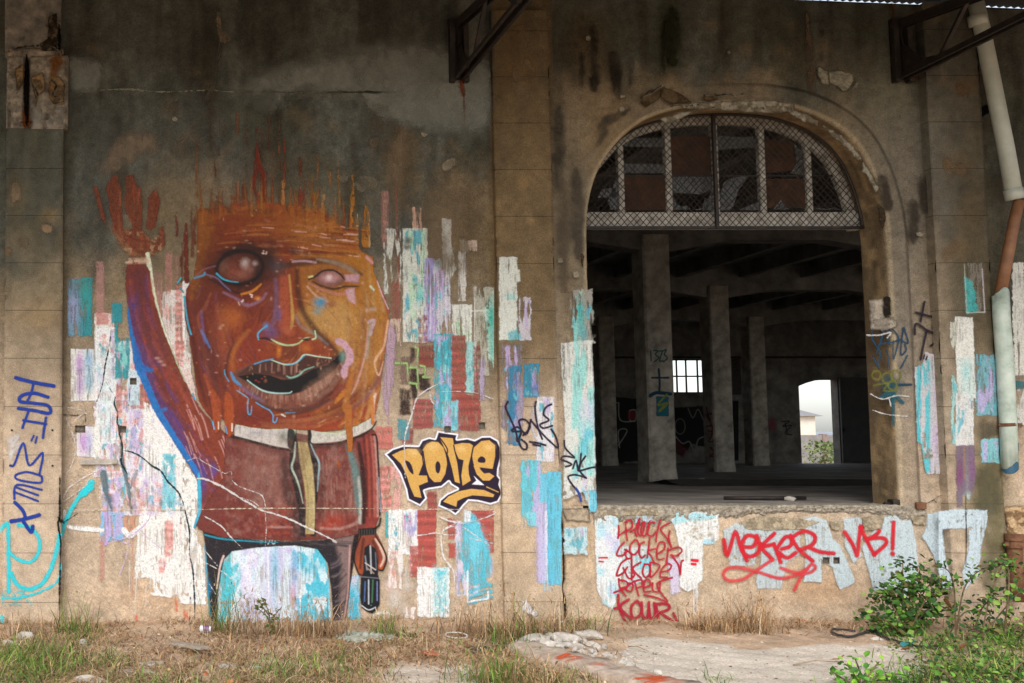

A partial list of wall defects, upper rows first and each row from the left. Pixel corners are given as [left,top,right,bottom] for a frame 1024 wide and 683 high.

flaking render [15,64,65,104]
damp [580,30,621,91]
spalling [817,66,860,91]
flaking render [641,86,879,192]
crack [57,336,390,619]